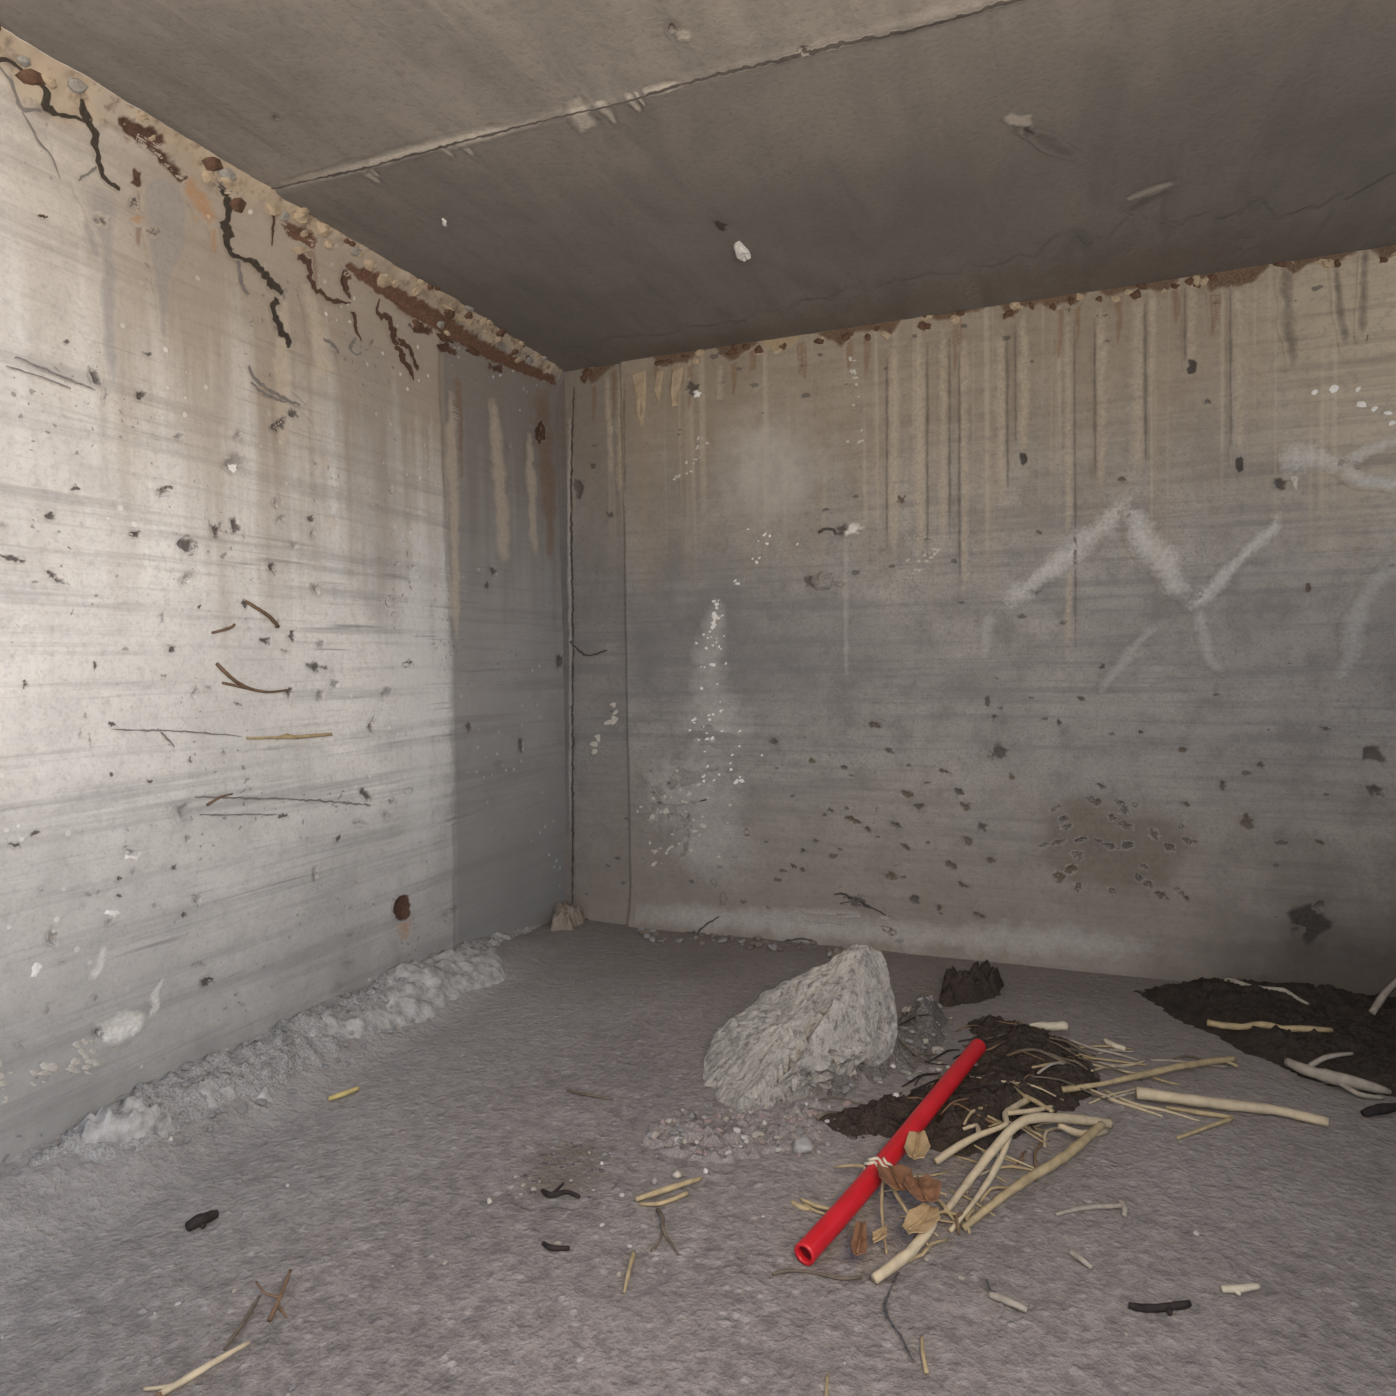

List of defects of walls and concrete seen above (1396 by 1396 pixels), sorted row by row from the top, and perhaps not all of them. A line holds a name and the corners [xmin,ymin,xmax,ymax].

crack [0,56,121,192]
corrosion [128,166,148,253]
corrosion [175,169,221,261]
corrosion [563,172,1396,429]
damp [1275,261,1301,379]
damp [1330,250,1371,353]
damp [884,328,974,622]
damp [991,313,1034,521]
damp [1061,292,1158,691]
damp [1356,386,1396,426]
damp [631,597,1228,969]
damp [0,978,165,1104]